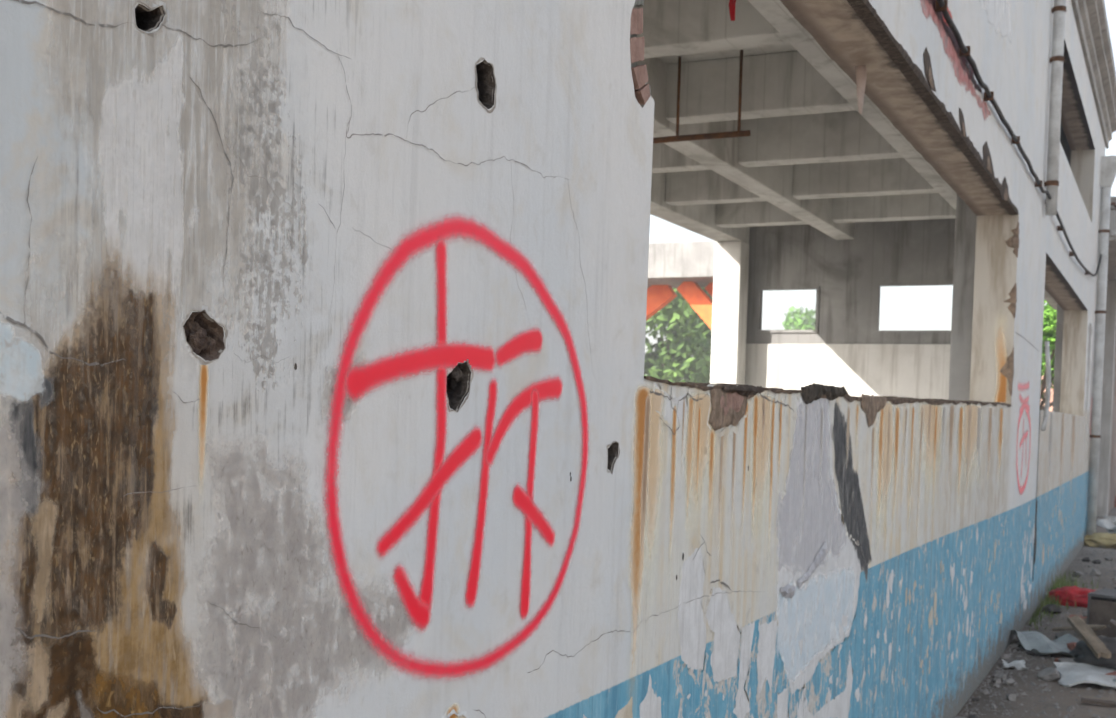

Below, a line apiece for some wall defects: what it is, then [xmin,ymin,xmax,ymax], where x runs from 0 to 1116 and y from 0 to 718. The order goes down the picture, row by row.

crack [15,0,135,28]
spalling [131,0,167,38]
crack [162,11,596,380]
spalling [847,0,1020,258]
rust [200,365,208,472]
damp [0,19,414,718]
rust [871,335,1007,496]
crack [528,536,765,673]
rust [632,387,782,627]
peeling [644,347,1014,718]
peeling [1021,499,1075,611]
peeling [613,672,662,718]